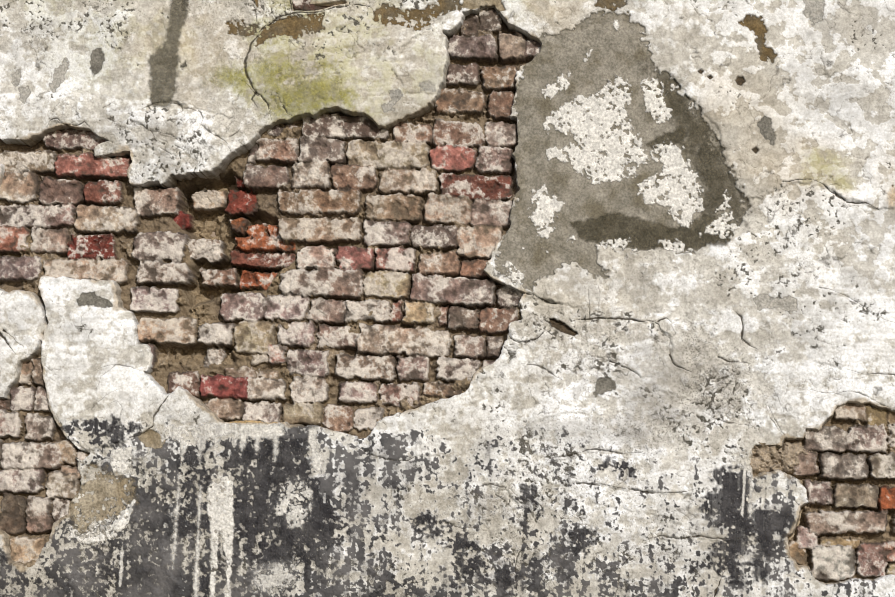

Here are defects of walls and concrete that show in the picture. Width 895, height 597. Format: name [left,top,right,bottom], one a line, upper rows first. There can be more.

water stain [148,0,188,107]
crack [244,0,374,120]
peeling [738,14,777,63]
spalling [0,0,751,568]
crack [509,293,689,380]
crack [718,312,757,371]
water stain [60,416,143,452]
water stain [172,423,351,597]
water stain [409,510,517,596]
water stain [598,455,637,480]
water stain [699,465,796,586]
spalling [750,401,895,586]